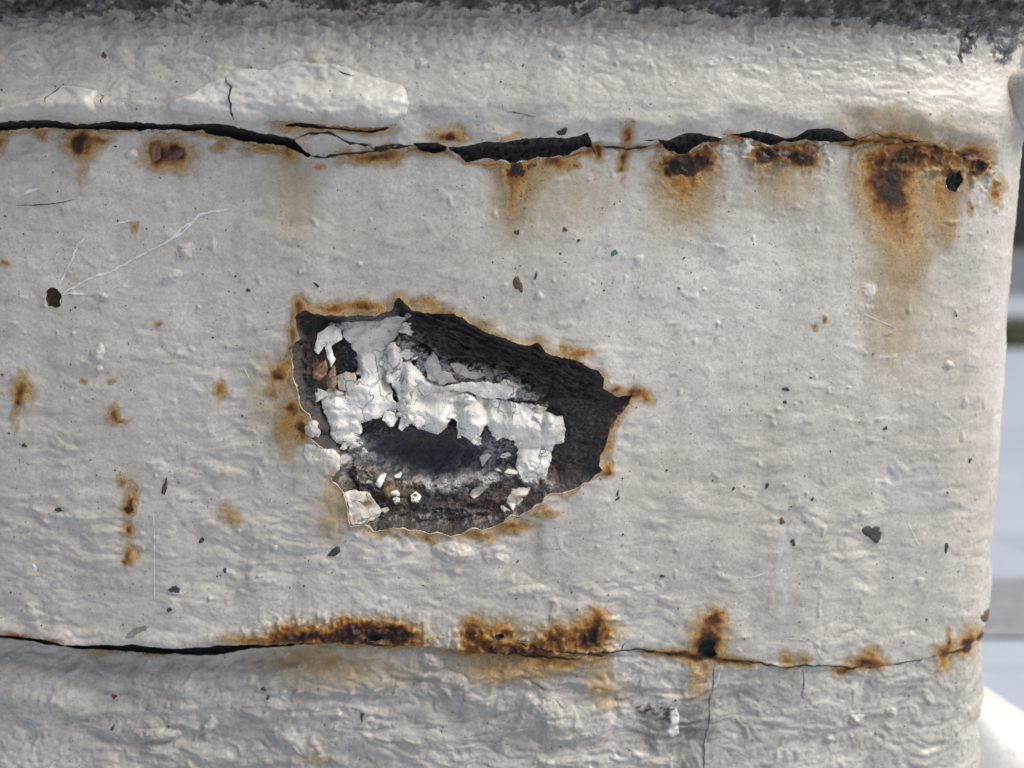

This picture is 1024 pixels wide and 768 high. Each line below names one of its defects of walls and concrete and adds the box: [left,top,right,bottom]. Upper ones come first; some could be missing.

rust [0,128,299,173]
crack [0,79,979,164]
rust [276,121,1006,281]
rust [266,294,655,479]
spalling [291,297,632,537]
rust [117,474,139,566]
crack [0,635,414,656]
rust [220,613,434,650]
rust [449,604,618,684]
crack [508,643,682,660]
rust [643,605,758,692]
crack [703,632,984,768]